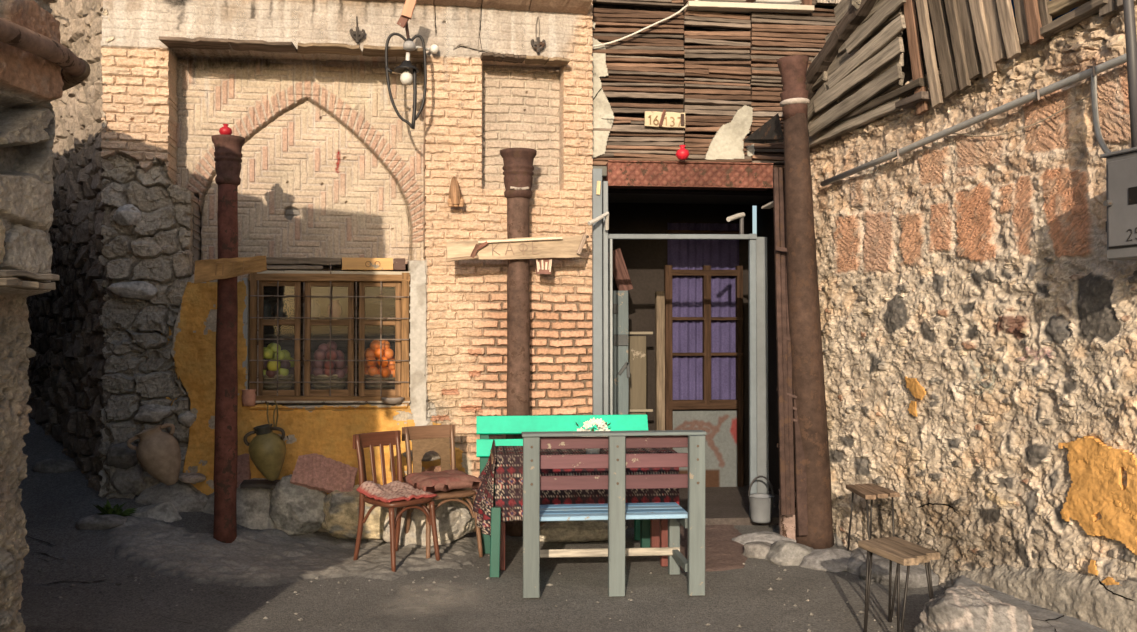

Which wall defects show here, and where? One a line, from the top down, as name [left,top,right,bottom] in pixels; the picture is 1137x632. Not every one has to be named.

flaking render [592,21,614,159]
flaking render [705,105,755,160]
peeling [905,376,926,417]
peeling [1058,436,1137,555]
peeling [1088,560,1120,586]
crack [1098,579,1134,601]